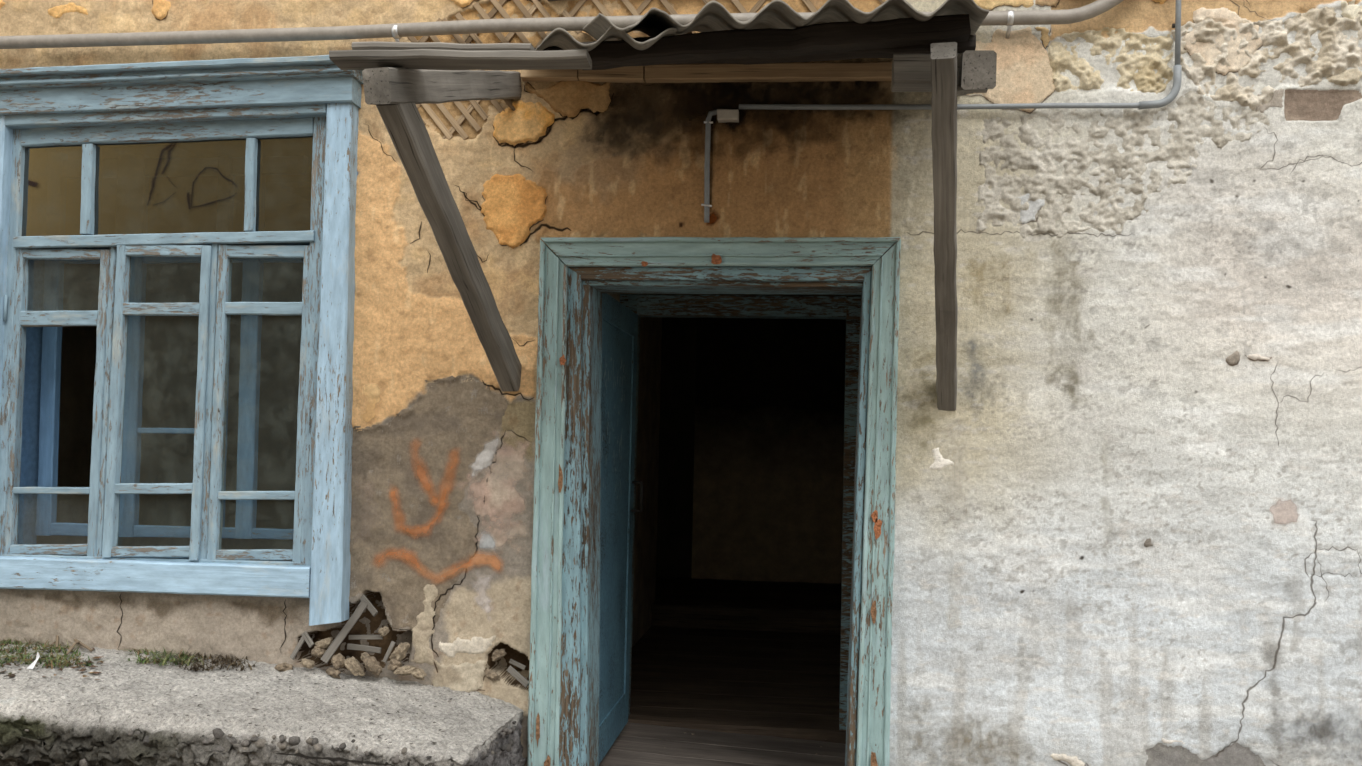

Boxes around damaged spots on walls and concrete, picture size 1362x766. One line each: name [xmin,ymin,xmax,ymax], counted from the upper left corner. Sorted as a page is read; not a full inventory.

peeling [48,3,88,18]
peeling [451,0,479,8]
peeling [493,80,611,146]
leakage [592,81,891,205]
spalling [964,0,1362,239]
crack [1261,132,1362,174]
peeling [480,174,548,249]
crack [1270,362,1360,446]
peeling [274,376,529,693]
crack [1214,520,1362,757]
peeling [1050,753,1091,766]
spalling [1145,738,1266,766]